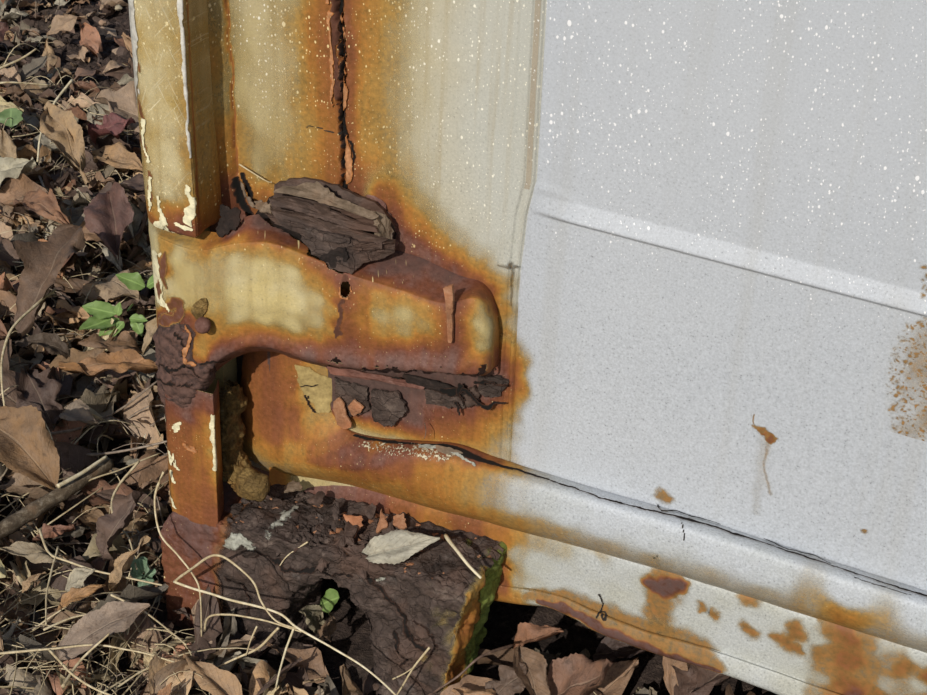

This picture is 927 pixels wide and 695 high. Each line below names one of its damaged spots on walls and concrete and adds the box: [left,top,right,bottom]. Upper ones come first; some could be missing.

peeling [141,118,150,163]
crack [307,0,356,189]
peeling [148,176,197,233]
peeling [152,249,185,327]
peeling [294,365,332,414]
corrosion [136,0,725,690]
corrosion [752,414,778,444]
corrosion [888,321,927,441]
crack [353,434,927,596]
corrosion [737,589,927,695]